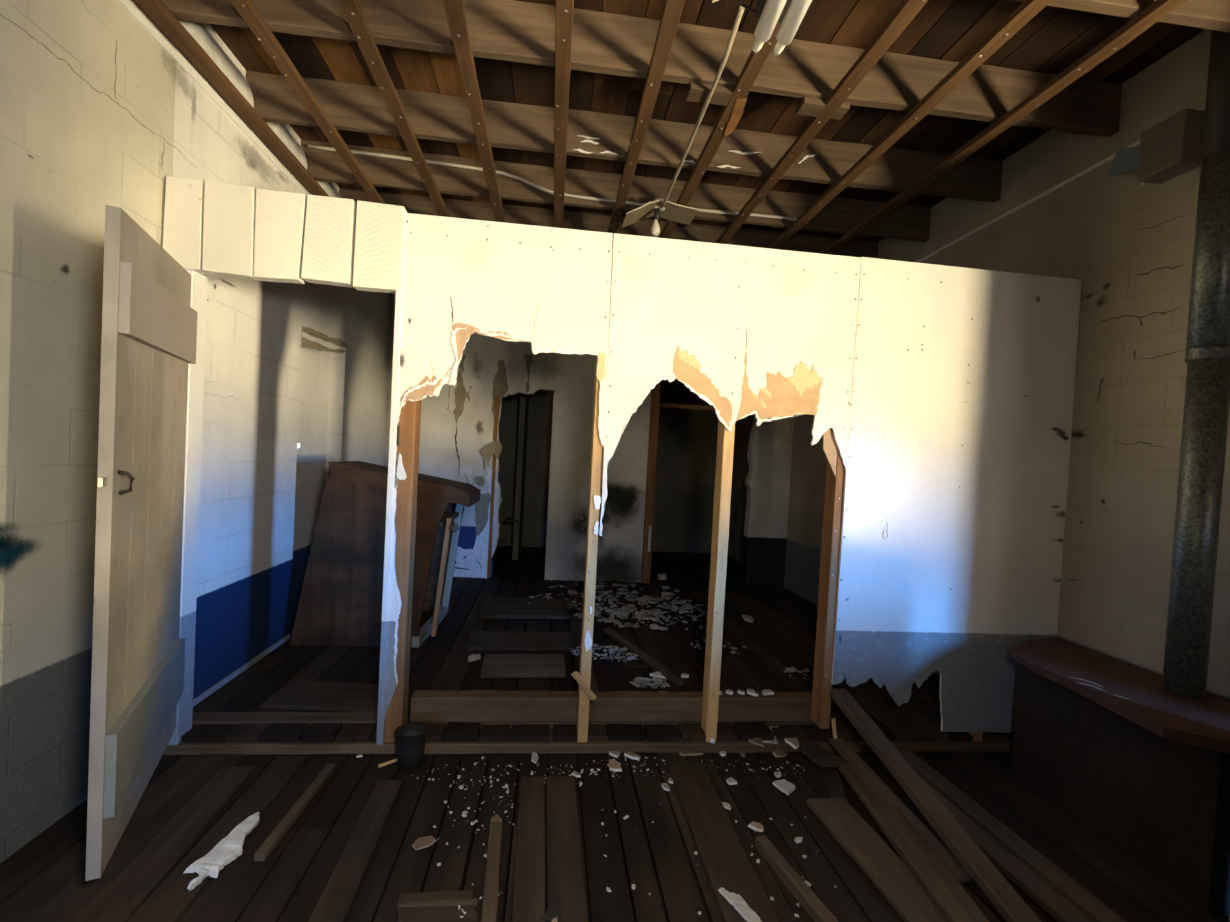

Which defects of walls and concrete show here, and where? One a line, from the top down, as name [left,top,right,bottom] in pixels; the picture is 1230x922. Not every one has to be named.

crack [0,14,198,171]
crack [1083,305,1184,360]
peeling [523,349,582,392]
spalling [622,378,798,434]
flaking render [453,355,508,580]
water stain [574,484,635,539]
water stain [579,552,639,582]